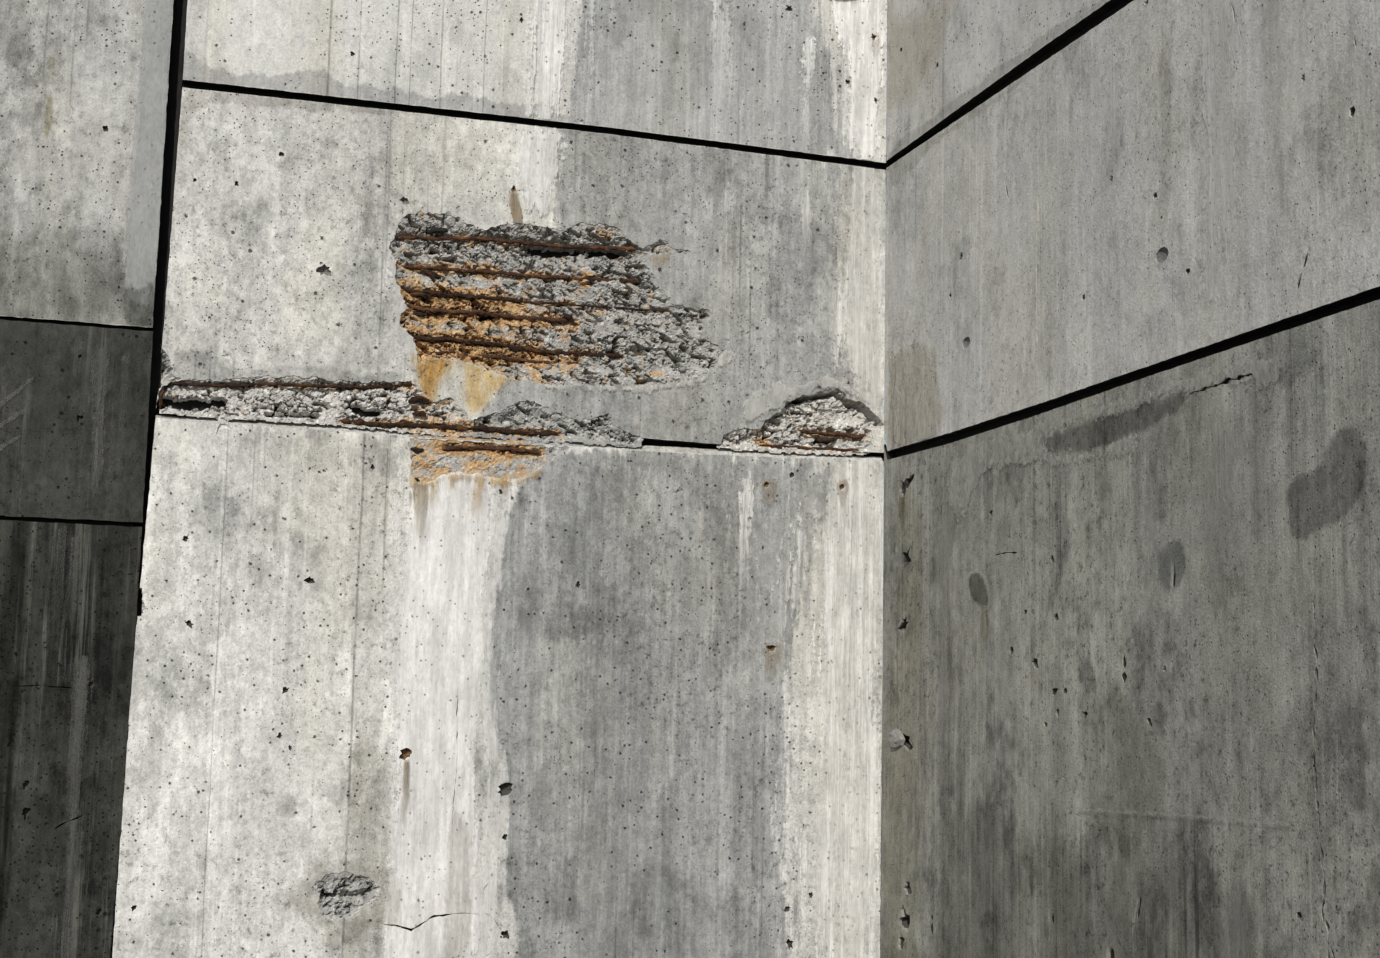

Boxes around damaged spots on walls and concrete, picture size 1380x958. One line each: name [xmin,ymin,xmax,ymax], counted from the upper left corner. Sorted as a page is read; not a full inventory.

spalling [389,211,722,387]
spalling [159,350,644,483]
spalling [717,357,936,456]
rust [409,468,542,508]
crack [1307,646,1335,958]
crack [380,885,498,955]